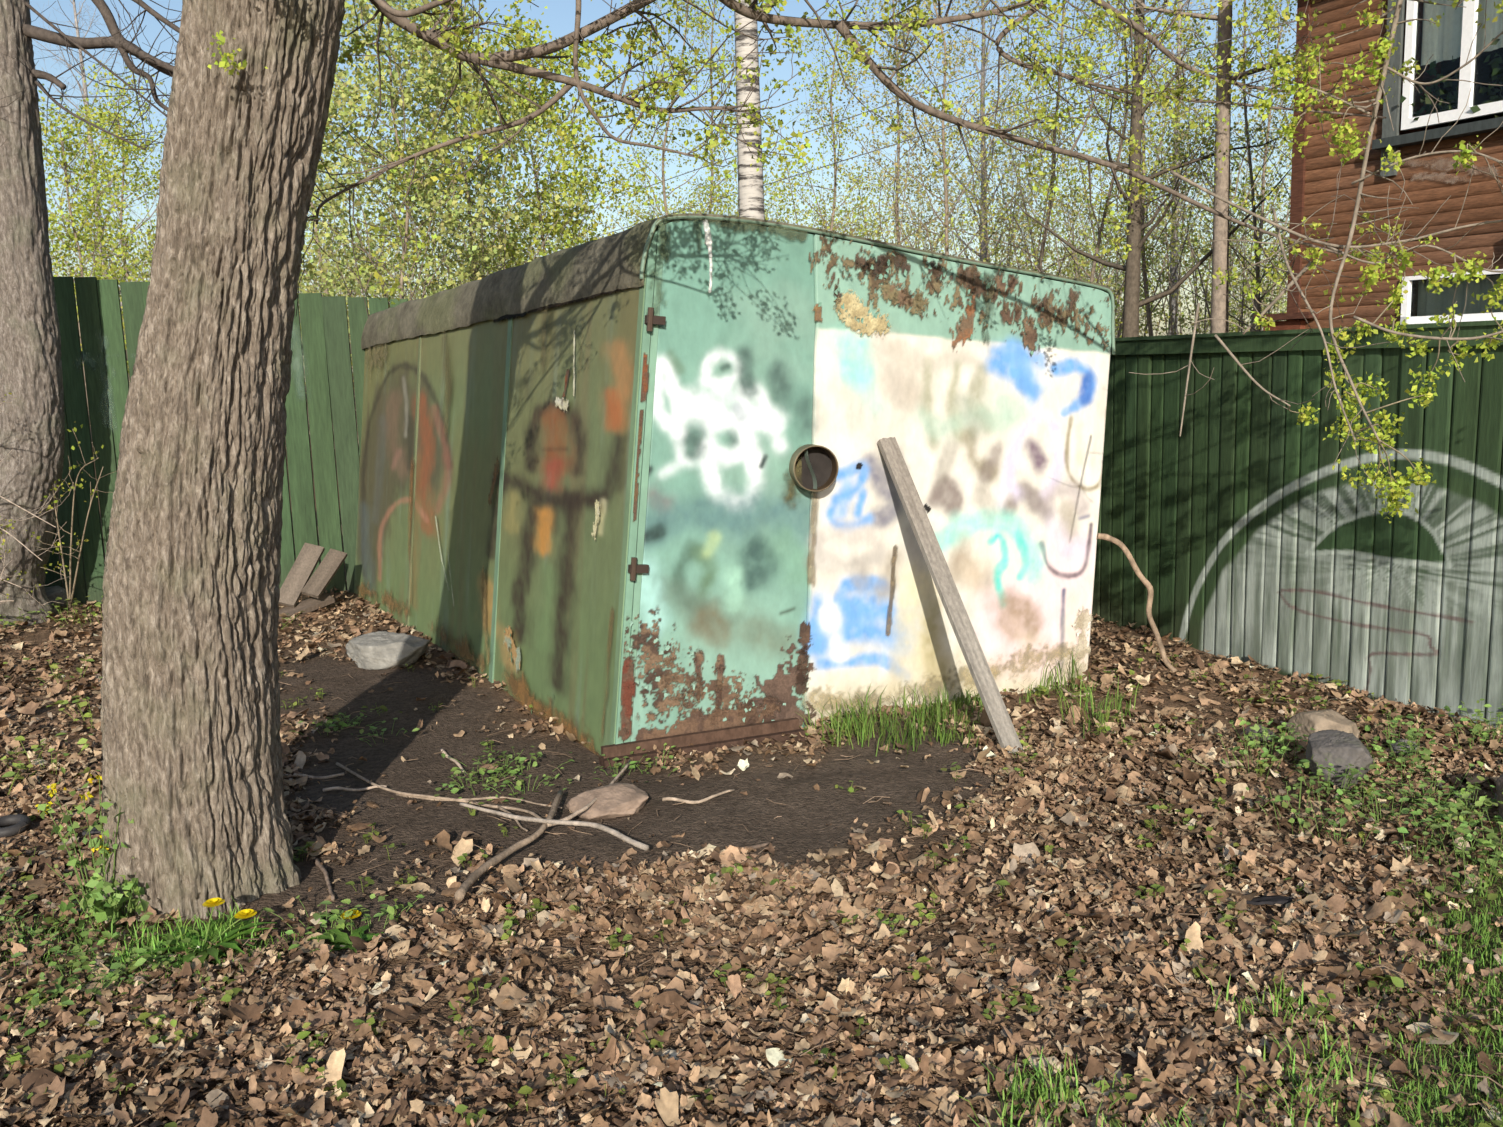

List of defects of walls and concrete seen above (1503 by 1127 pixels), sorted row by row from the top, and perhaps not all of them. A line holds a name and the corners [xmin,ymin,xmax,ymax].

corrosion [813,272,842,322]
corrosion [855,248,1090,355]
corrosion [501,609,816,754]